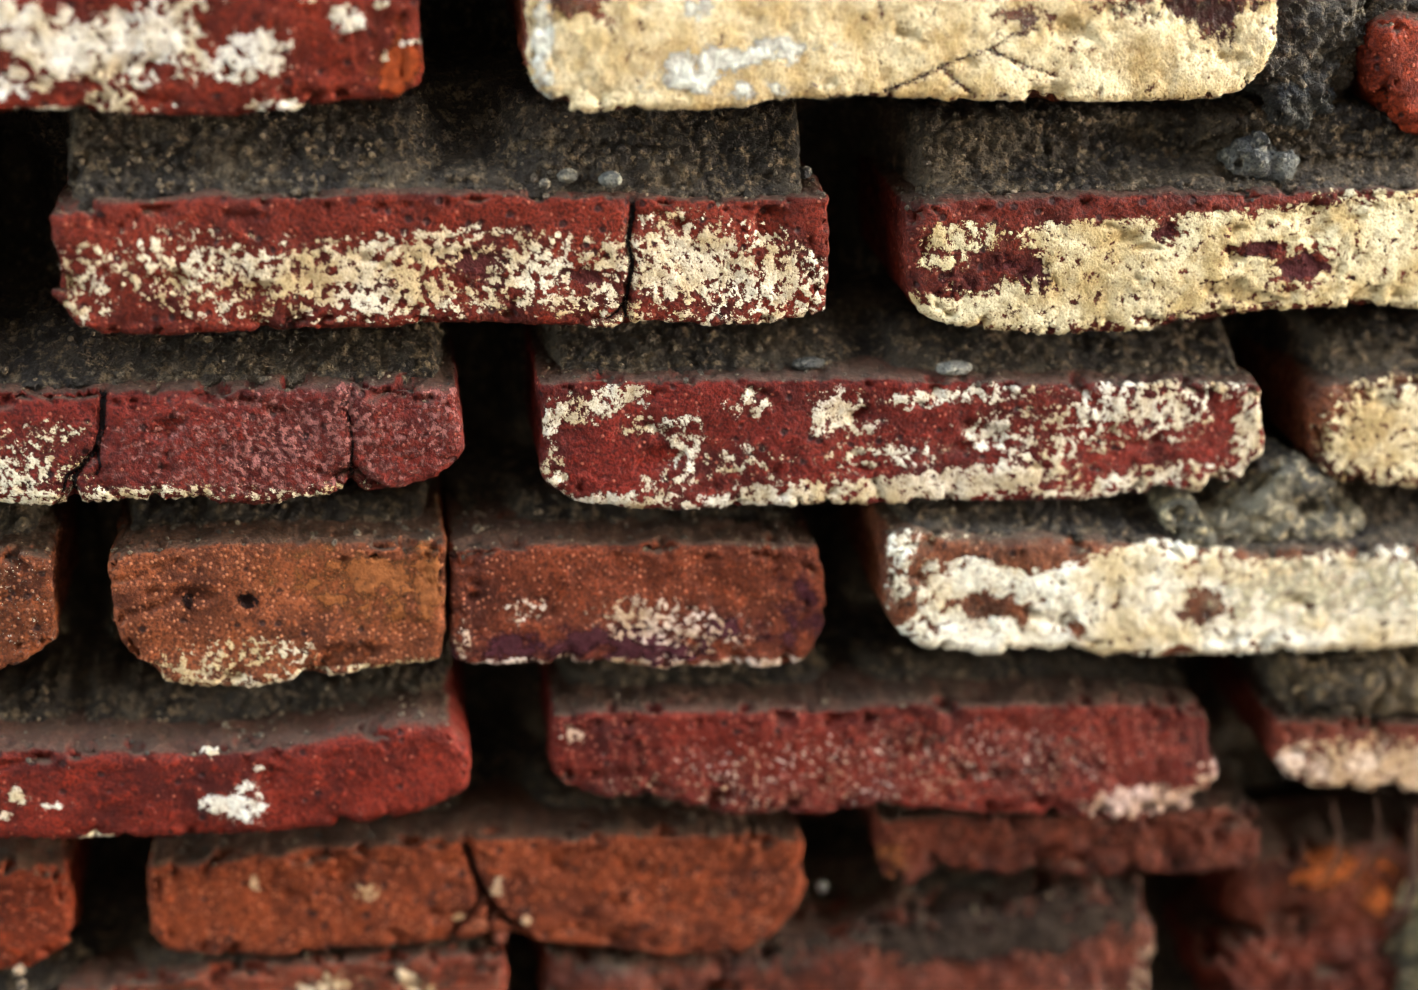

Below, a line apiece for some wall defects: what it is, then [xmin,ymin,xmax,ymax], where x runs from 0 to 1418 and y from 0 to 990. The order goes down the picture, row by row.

crack [606,200,636,319]
crack [63,389,107,491]